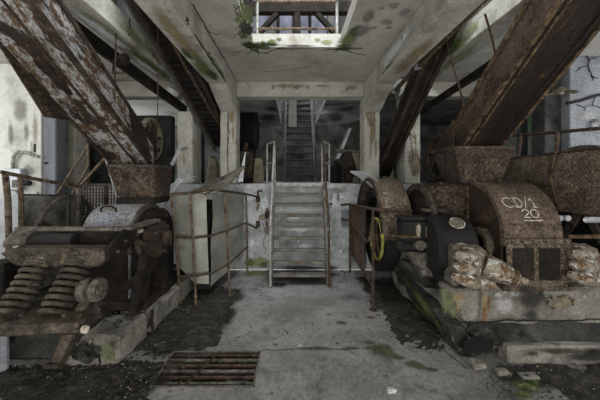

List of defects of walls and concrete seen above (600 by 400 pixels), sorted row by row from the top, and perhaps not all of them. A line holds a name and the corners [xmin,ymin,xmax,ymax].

water stain [76,12,129,49]
rust [25,42,88,114]
crack [576,55,600,81]